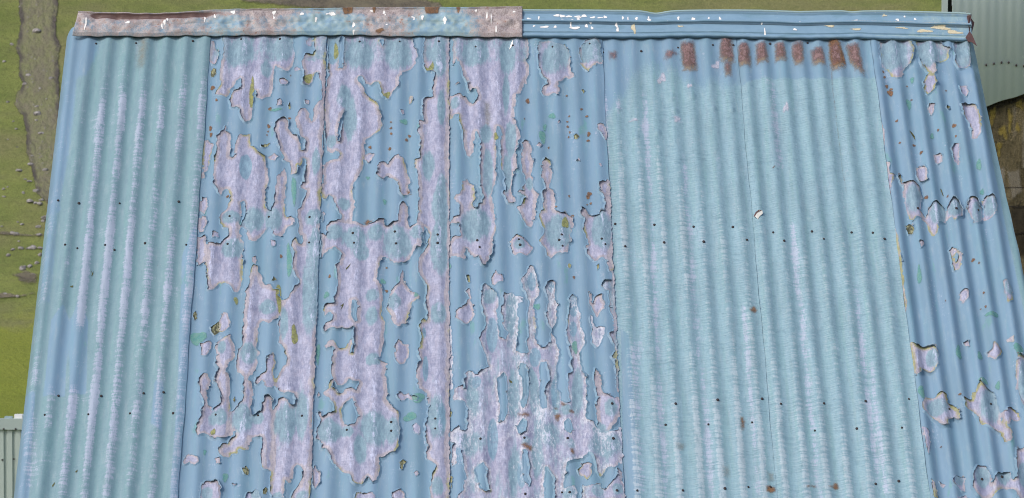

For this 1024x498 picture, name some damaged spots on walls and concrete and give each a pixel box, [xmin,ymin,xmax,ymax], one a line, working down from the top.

rust [666,42,696,70]
rust [720,38,862,75]
peeling [878,37,998,312]
peeling [193,35,626,498]
peeling [910,342,941,376]
peeling [921,335,1024,498]